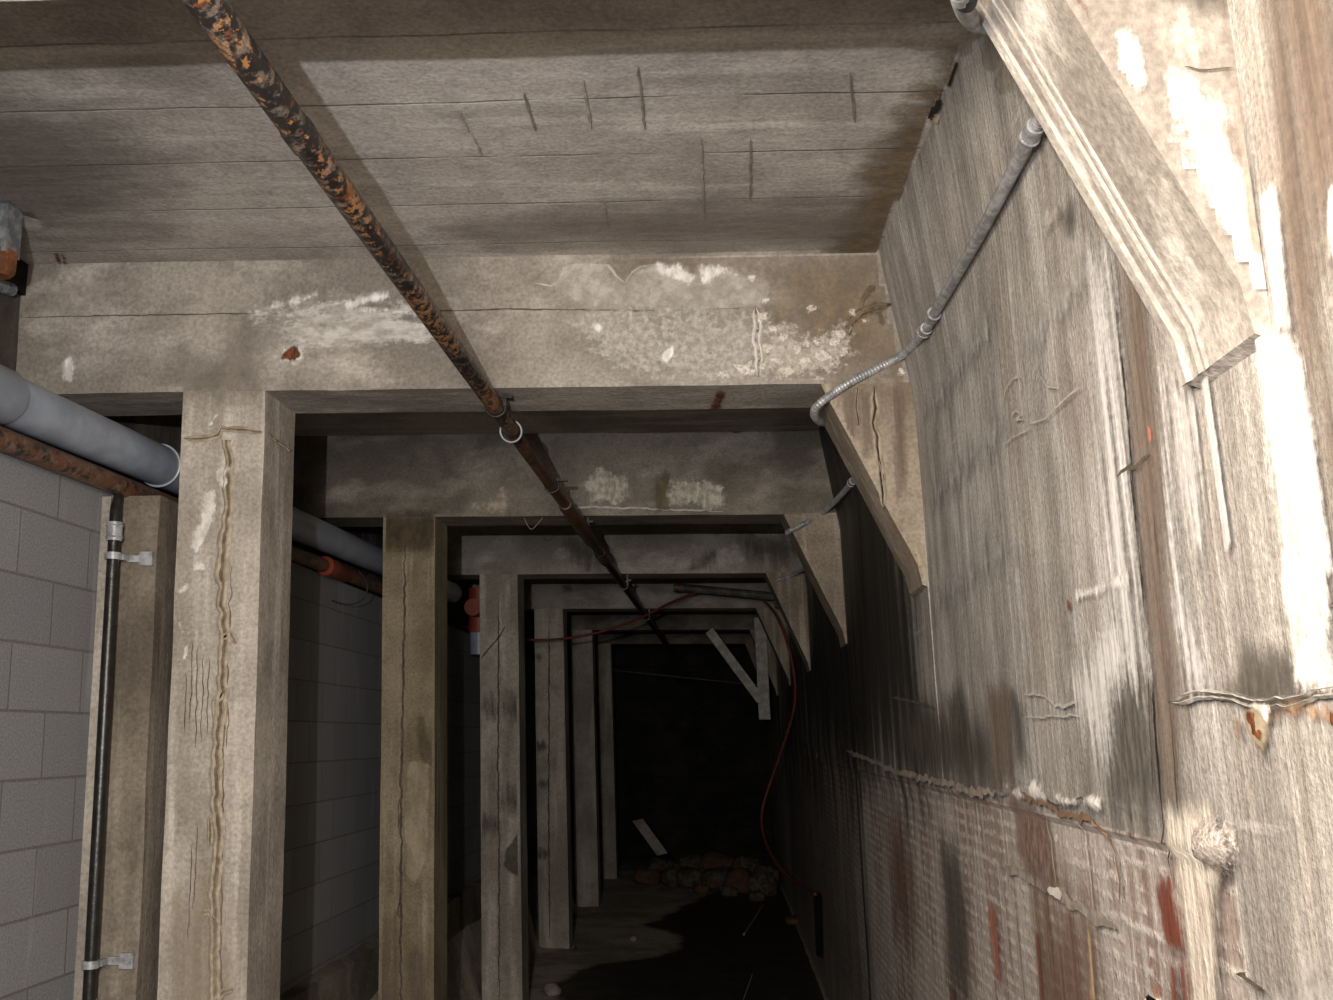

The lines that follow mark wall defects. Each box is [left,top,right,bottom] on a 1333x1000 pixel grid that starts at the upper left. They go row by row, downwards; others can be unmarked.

leakage [534,50,957,253]
leakage [249,292,433,351]
leakage [535,263,906,384]
leakage [656,472,727,511]
leakage [766,240,1230,1000]
crack [1110,258,1333,880]
crack [184,426,293,1000]
corrosion [1269,699,1333,726]
corrosion [988,906,1000,984]
corrosion [1008,786,1121,1000]
spalling [1144,987,1161,1000]
corrosion [1156,874,1192,1000]